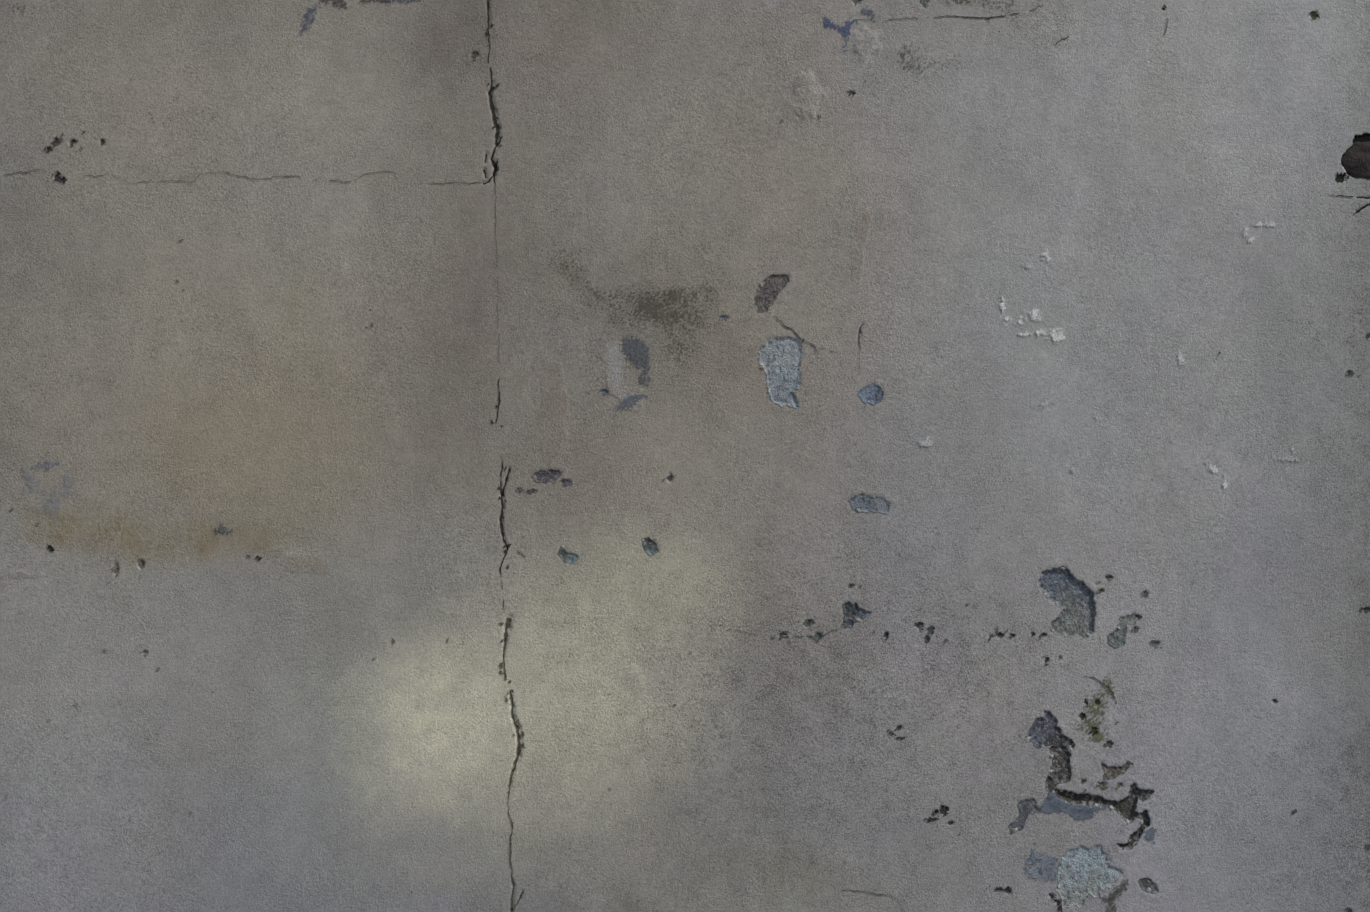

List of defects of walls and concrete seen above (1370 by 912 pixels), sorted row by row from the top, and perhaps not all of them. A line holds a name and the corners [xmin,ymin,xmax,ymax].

peeling [300,0,424,35]
peeling [820,0,875,52]
spalling [755,274,789,312]
peeling [599,335,651,411]
spalling [759,334,803,408]
spalling [858,382,884,405]
crack [5,0,526,912]
spalling [516,469,579,496]
spalling [849,493,891,514]
spalling [989,566,1163,649]
spalling [1009,699,1159,912]